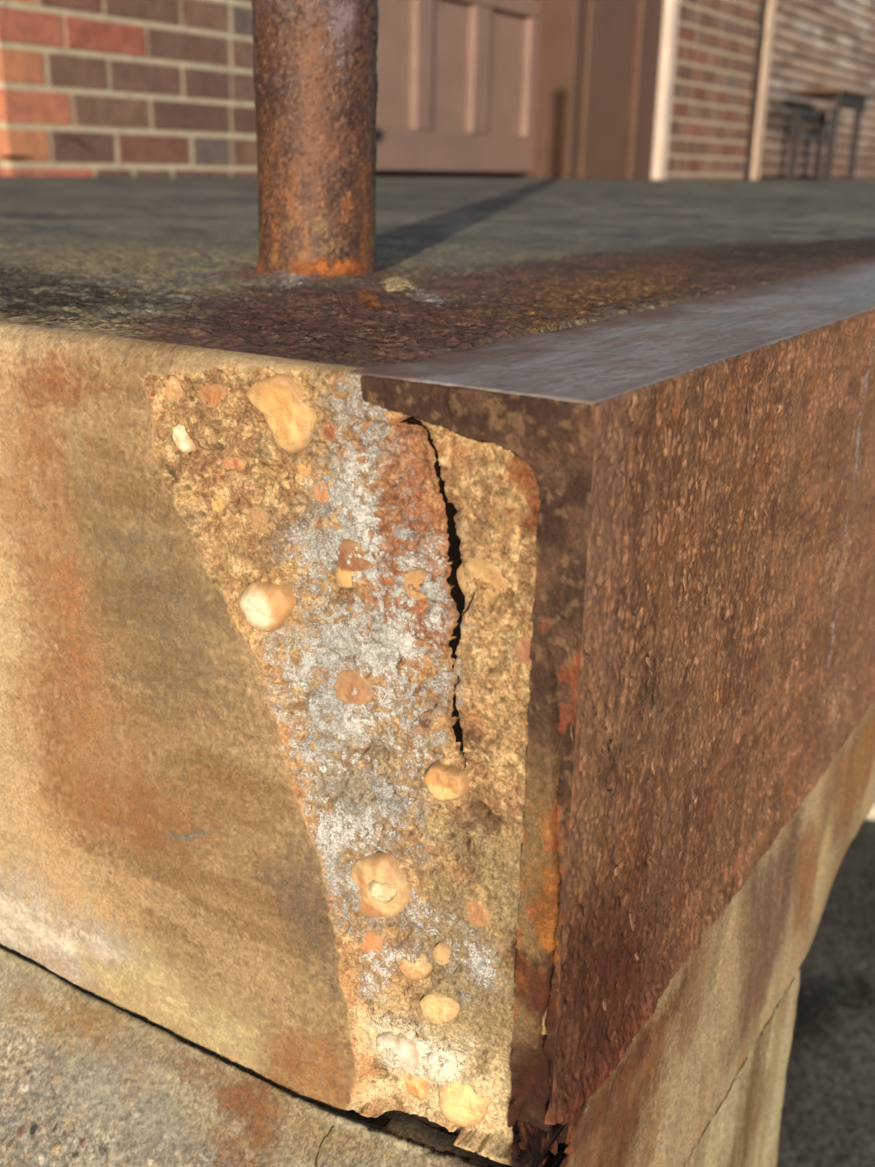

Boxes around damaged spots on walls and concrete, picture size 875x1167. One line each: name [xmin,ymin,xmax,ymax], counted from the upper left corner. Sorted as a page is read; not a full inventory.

rust [105,239,875,368]
rust [509,456,541,527]
crack [399,416,516,768]
spalling [142,366,569,1167]
rust [599,655,672,775]
rust [535,862,563,961]
rust [741,816,817,1038]
crack [0,943,493,1167]
rust [509,940,558,1122]
crack [722,951,809,1102]